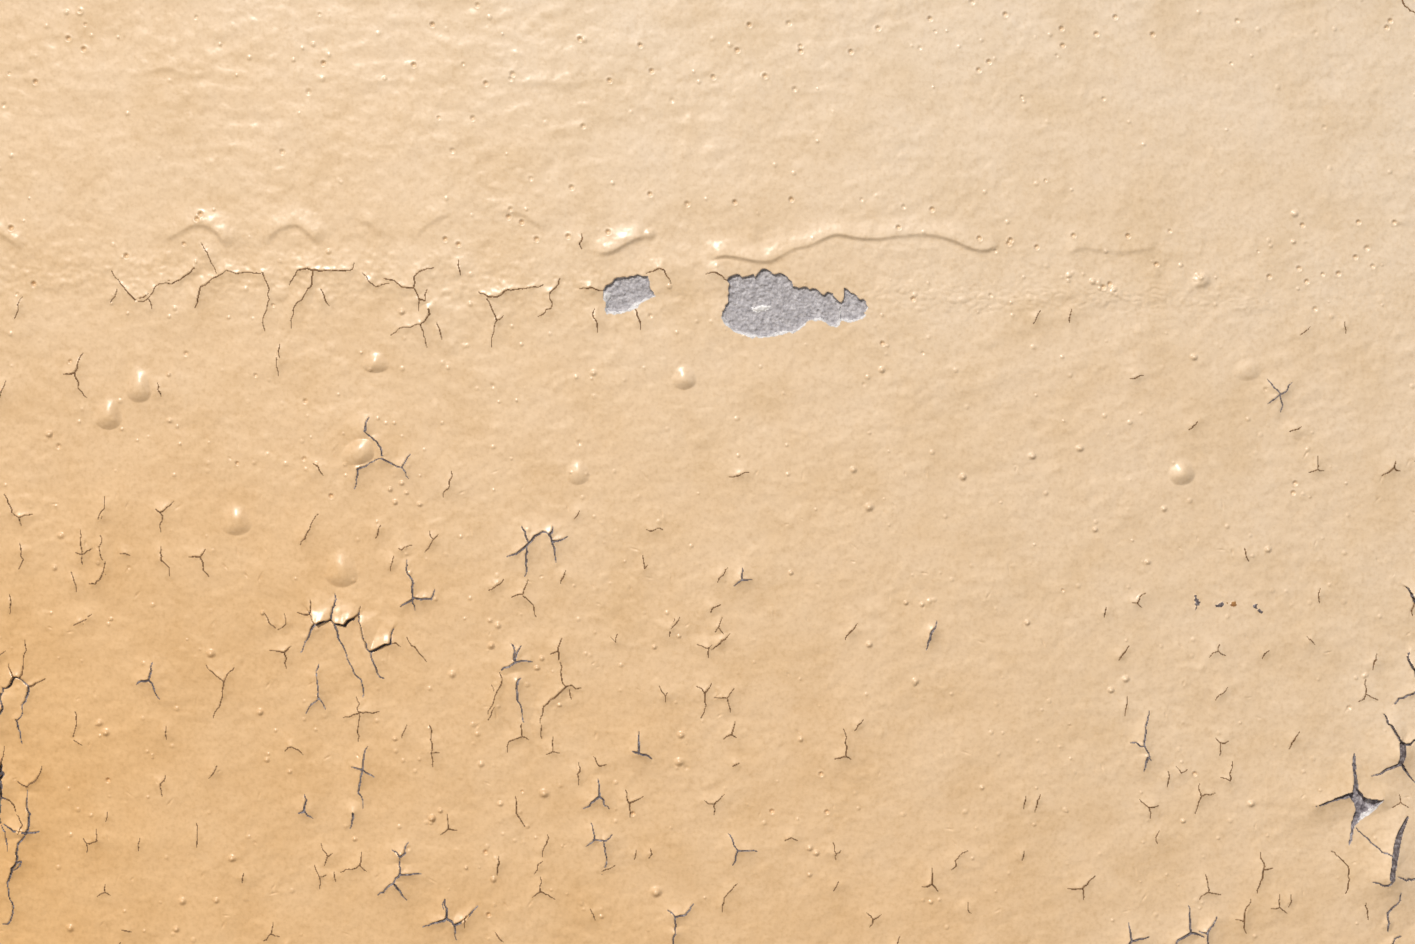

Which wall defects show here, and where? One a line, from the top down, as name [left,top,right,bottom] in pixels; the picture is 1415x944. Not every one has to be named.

crack [108,231,605,379]
spalling [603,274,655,315]
crack [633,265,728,332]
spalling [721,268,869,339]
crack [1379,458,1403,478]
crack [0,491,36,659]
crack [297,414,455,664]
crack [1356,651,1381,704]
crack [203,508,655,944]
crack [656,565,844,944]
crack [832,717,866,762]
crack [1328,848,1404,934]